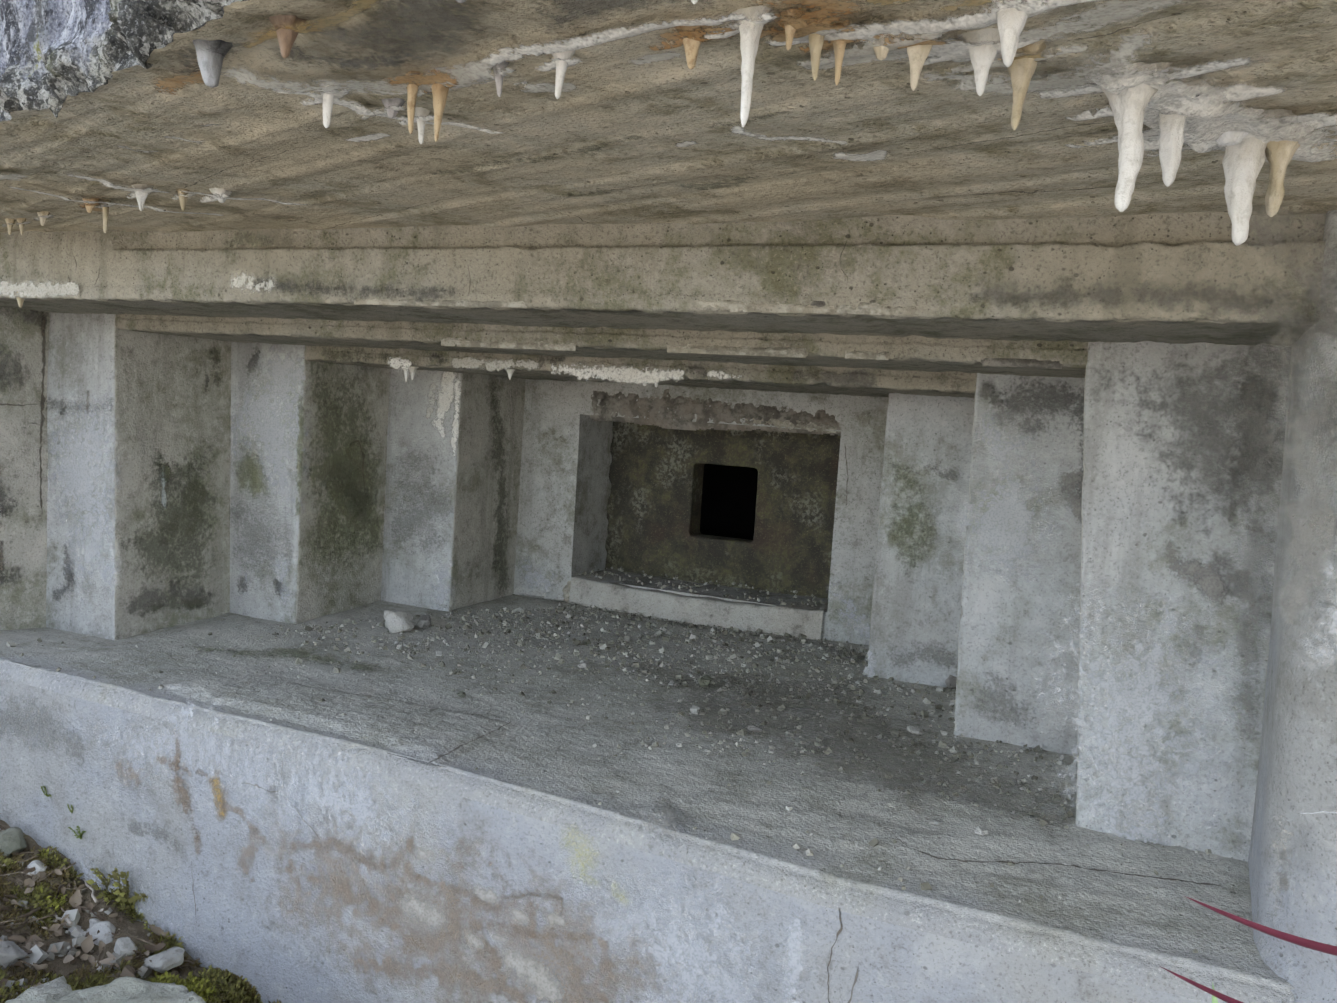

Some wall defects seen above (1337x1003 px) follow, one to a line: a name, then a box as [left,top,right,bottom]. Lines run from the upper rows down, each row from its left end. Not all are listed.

corrosion [660,27,735,41]
corrosion [755,0,860,43]
leakage [227,0,746,134]
leakage [346,133,390,142]
leakage [731,126,887,161]
leakage [129,585,212,616]
leakage [117,710,750,1003]
crack [887,829,1219,886]
crack [827,909,858,1003]